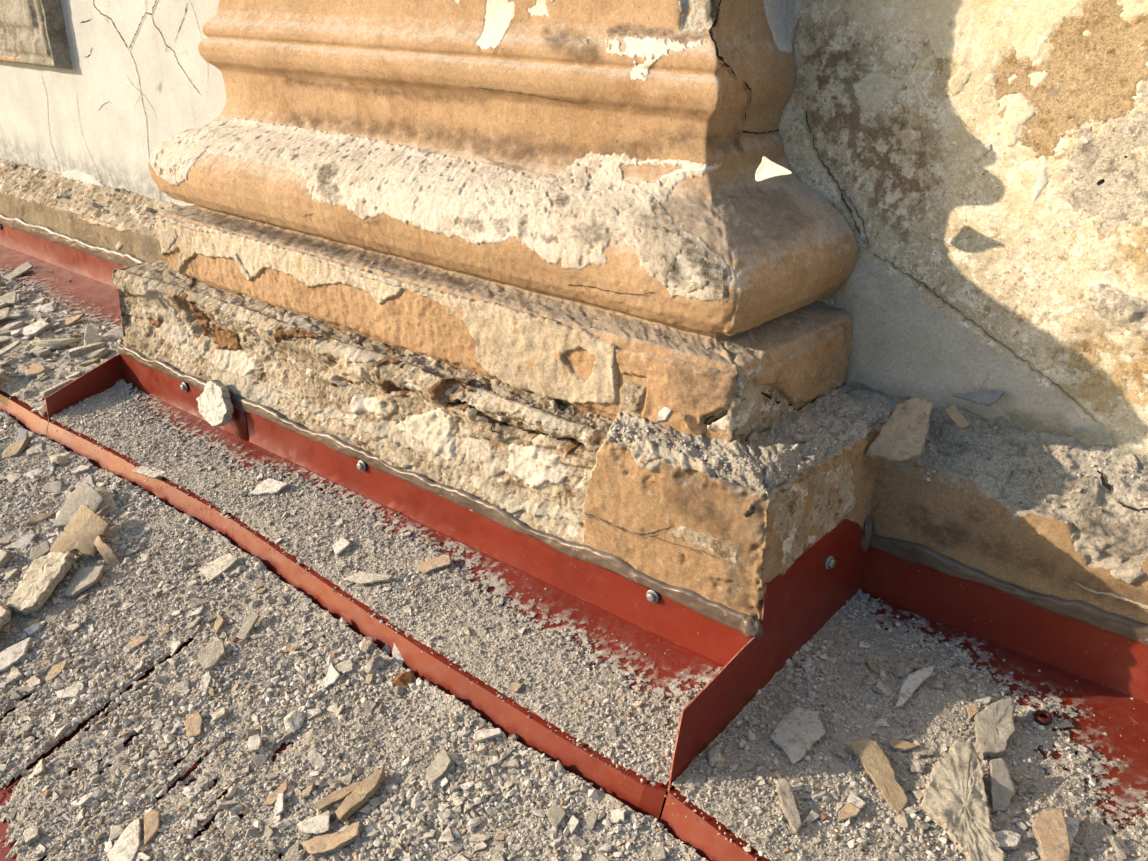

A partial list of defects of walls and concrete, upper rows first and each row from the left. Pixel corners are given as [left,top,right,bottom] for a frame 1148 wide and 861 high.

crack [76,0,208,194]
peeling [149,118,732,302]
peeling [475,0,554,50]
peeling [583,0,719,81]
peeling [755,156,792,181]
peeling [844,0,1148,238]
spalling [101,207,848,545]
spalling [94,535,121,568]
spalling [199,553,241,583]
spalling [332,537,351,556]
peeling [765,428,856,568]
spalling [865,395,1148,585]